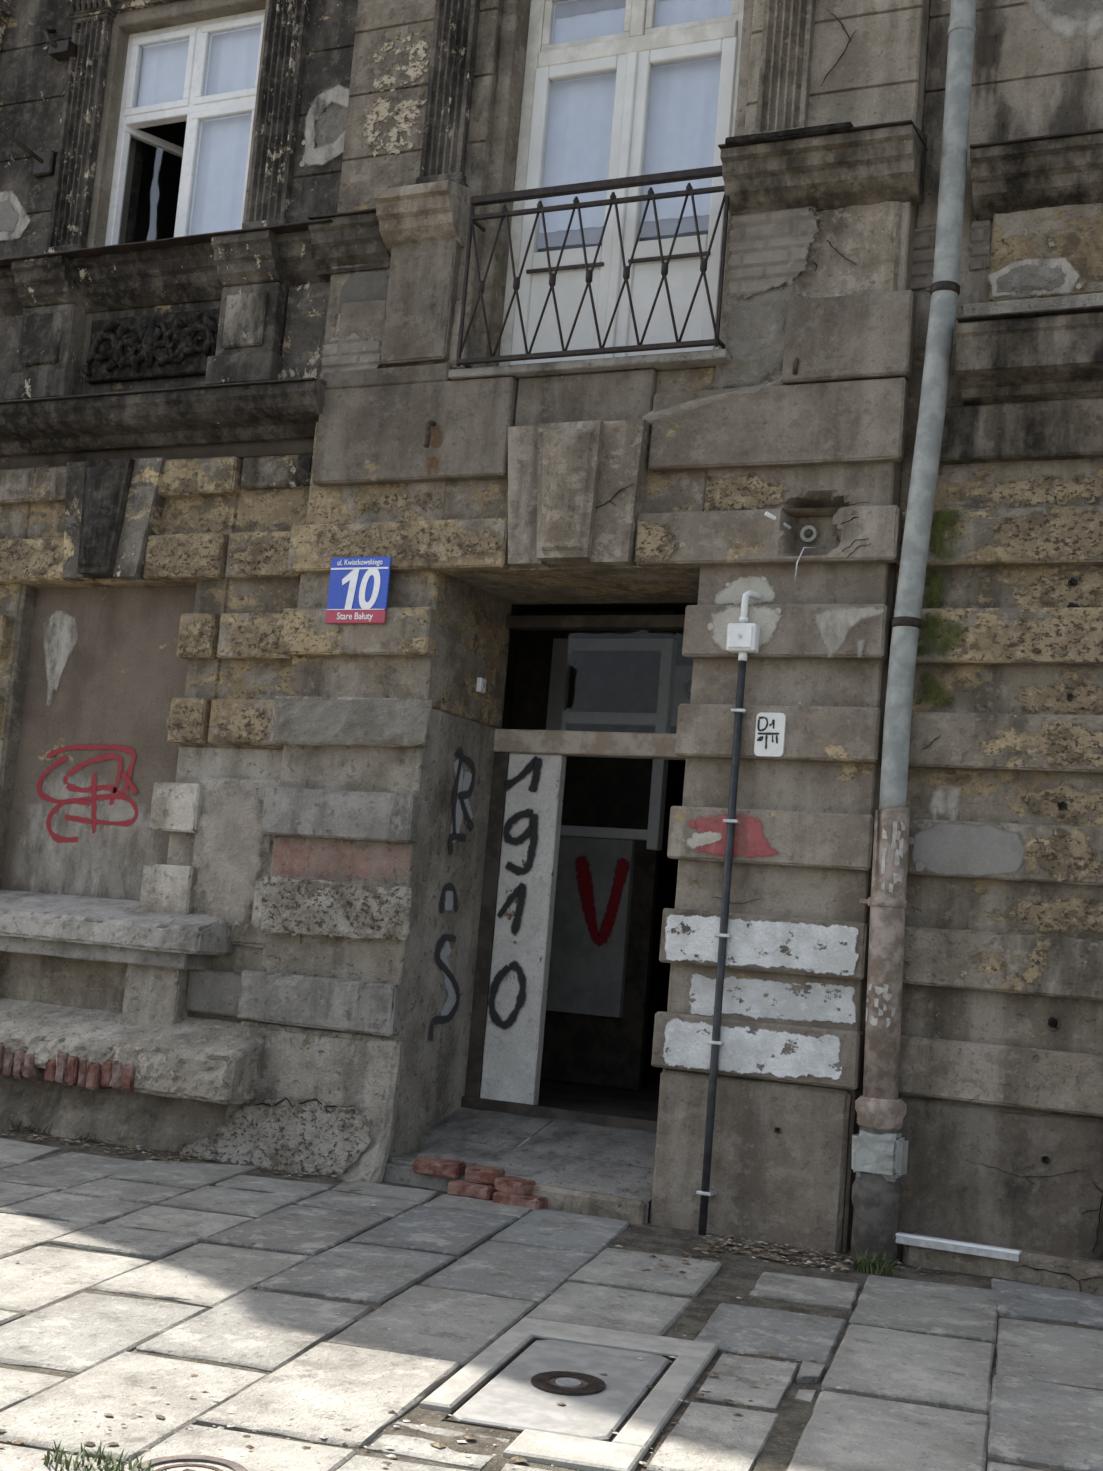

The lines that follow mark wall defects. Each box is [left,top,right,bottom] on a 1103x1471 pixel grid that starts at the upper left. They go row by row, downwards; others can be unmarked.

spalling [299,33,429,167]
water stain [976,0,1008,141]
spalling [1027,0,1103,39]
flaking render [712,206,819,389]
spalling [179,1097,371,1176]
crack [952,1157,1103,1292]